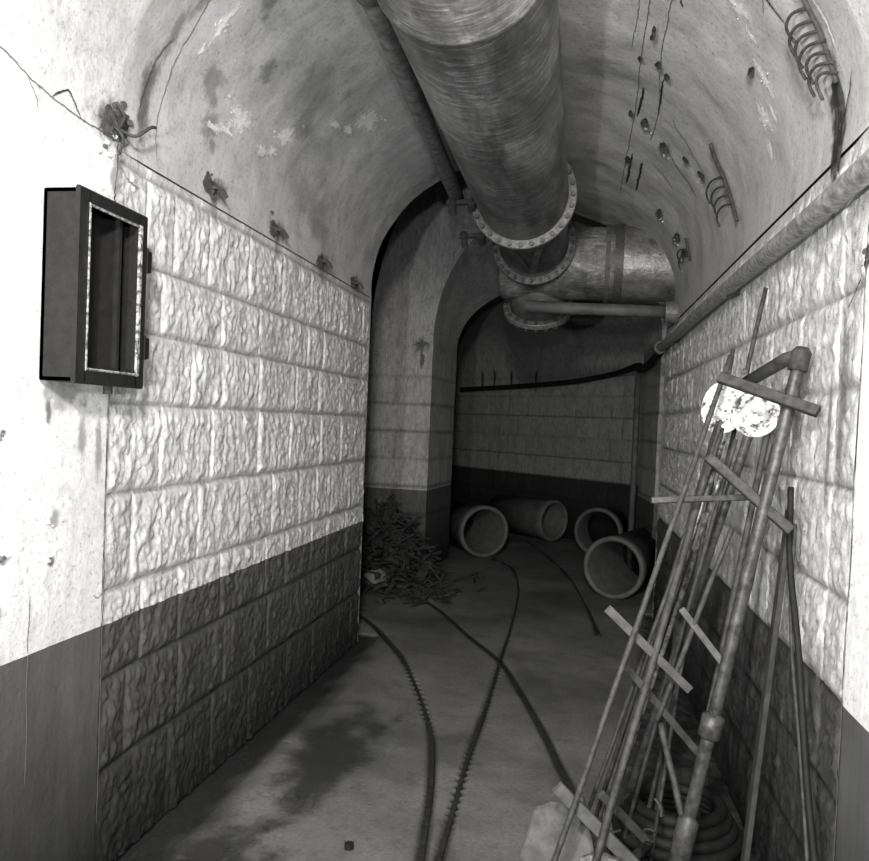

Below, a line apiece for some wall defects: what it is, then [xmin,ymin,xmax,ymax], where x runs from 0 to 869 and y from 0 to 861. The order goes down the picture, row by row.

crack [138,0,211,158]
damp [281,712,386,815]